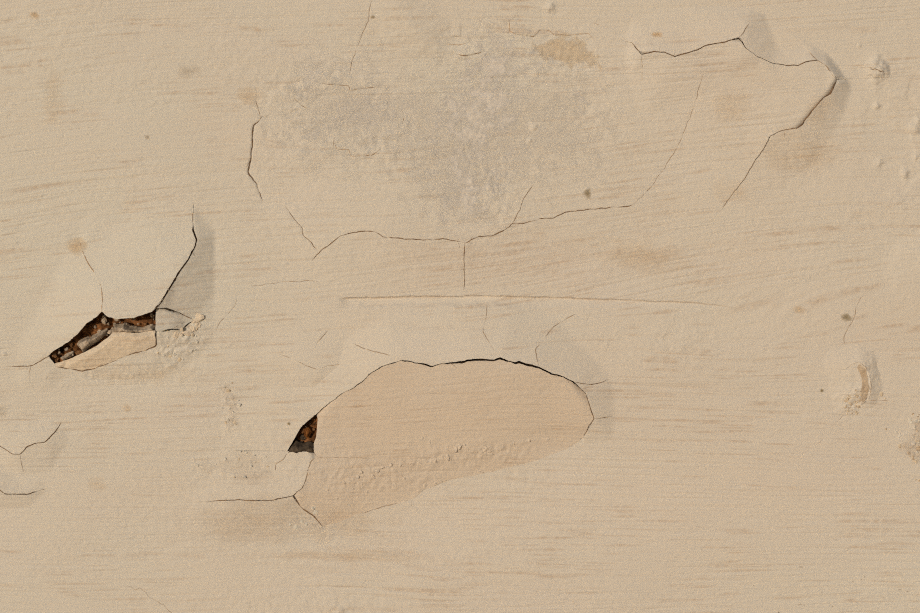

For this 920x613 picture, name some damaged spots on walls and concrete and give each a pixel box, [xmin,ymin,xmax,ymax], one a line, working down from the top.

crack [248,103,315,248]